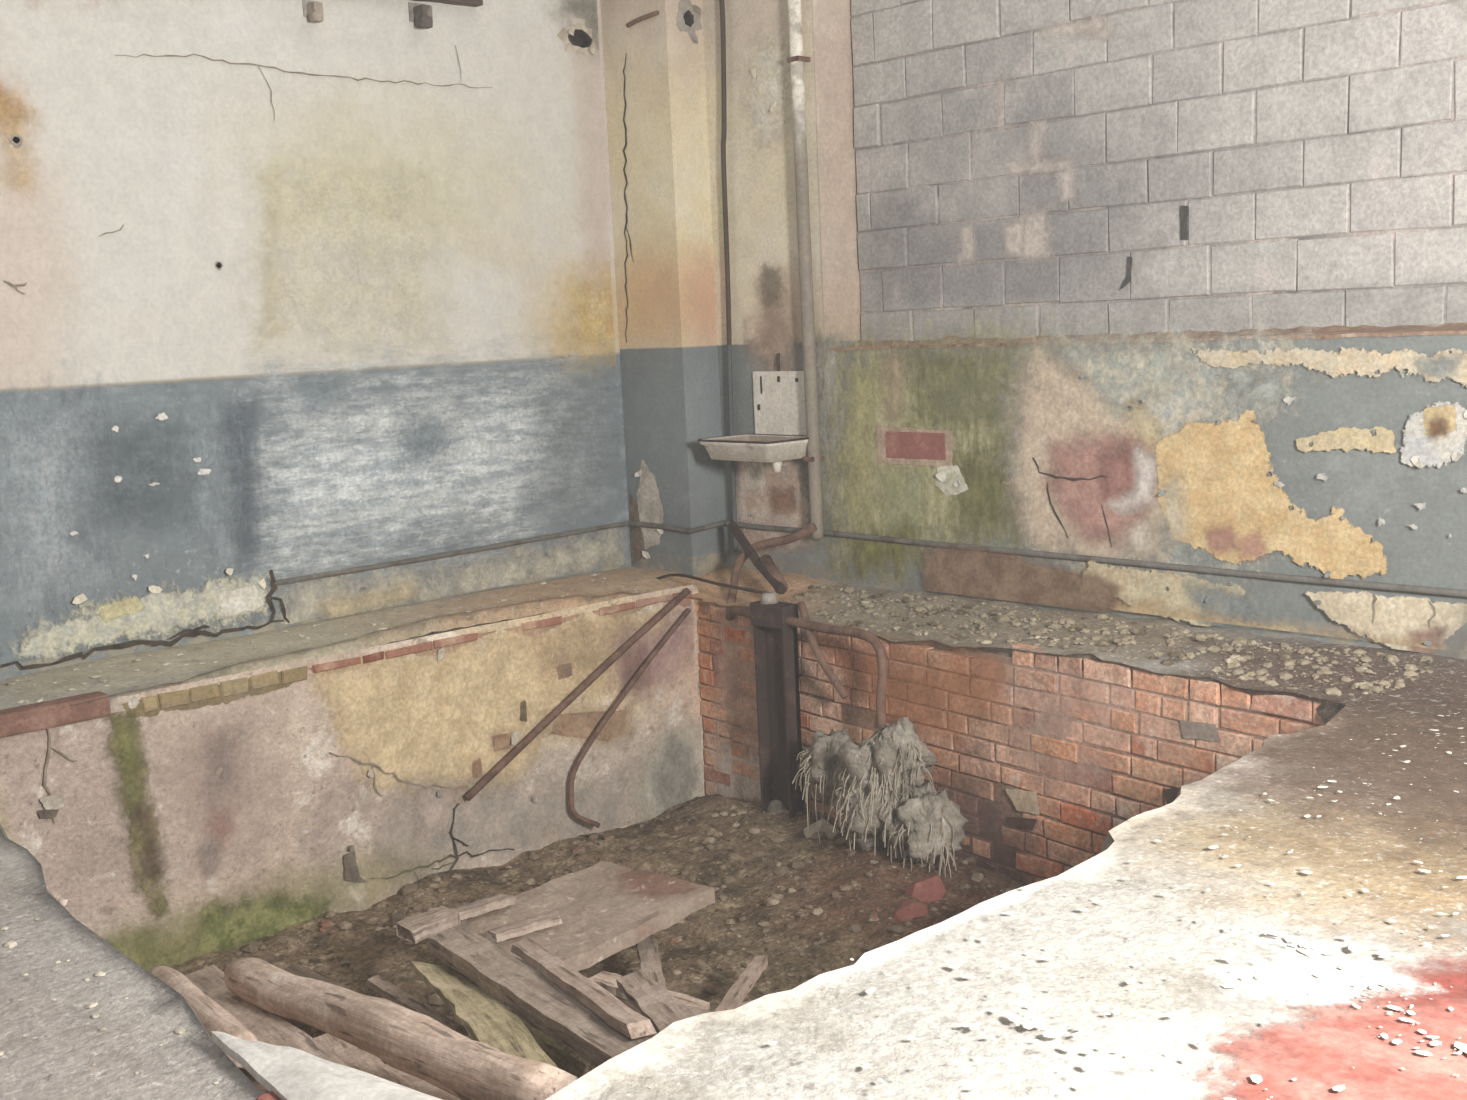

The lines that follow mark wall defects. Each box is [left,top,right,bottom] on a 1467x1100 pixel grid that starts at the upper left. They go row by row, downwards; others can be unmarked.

crack [115,45,492,121]
crack [623,57,634,343]
damp [744,269,795,371]
peeling [11,458,664,660]
damp [815,335,1026,574]
crack [1032,457,1112,548]
peeling [1007,337,1467,654]
crack [330,752,515,881]
spalling [0,584,1325,1040]
peeling [1182,767,1467,1058]
peeling [1375,712,1467,792]
peeling [1223,1074,1273,1100]